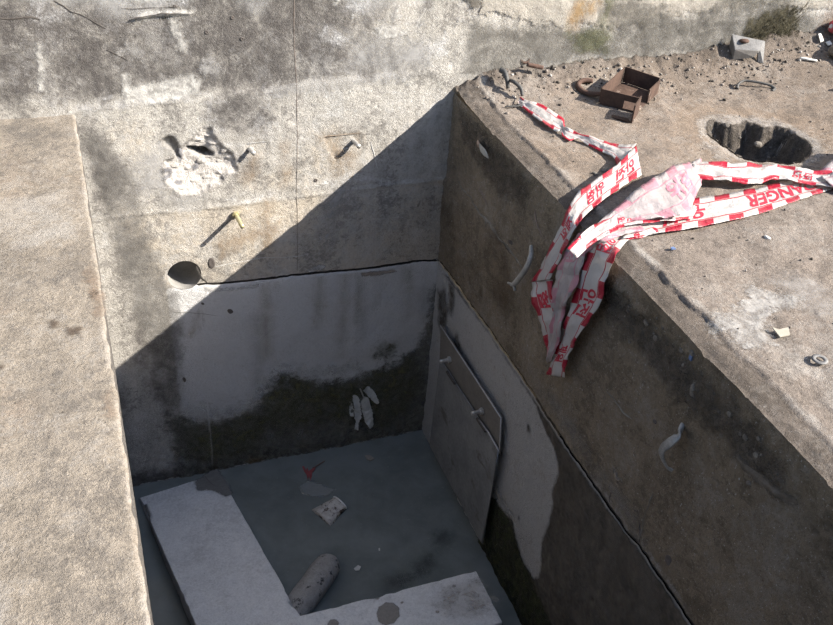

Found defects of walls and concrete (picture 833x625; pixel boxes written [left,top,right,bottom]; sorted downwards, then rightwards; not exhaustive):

crack [0,14,41,22]
water stain [170,19,186,50]
water stain [470,0,791,71]
peeling [468,0,833,31]
water stain [36,43,45,91]
water stain [122,61,217,105]
spalling [161,126,238,196]
water stain [165,277,467,478]
water stain [491,391,688,625]